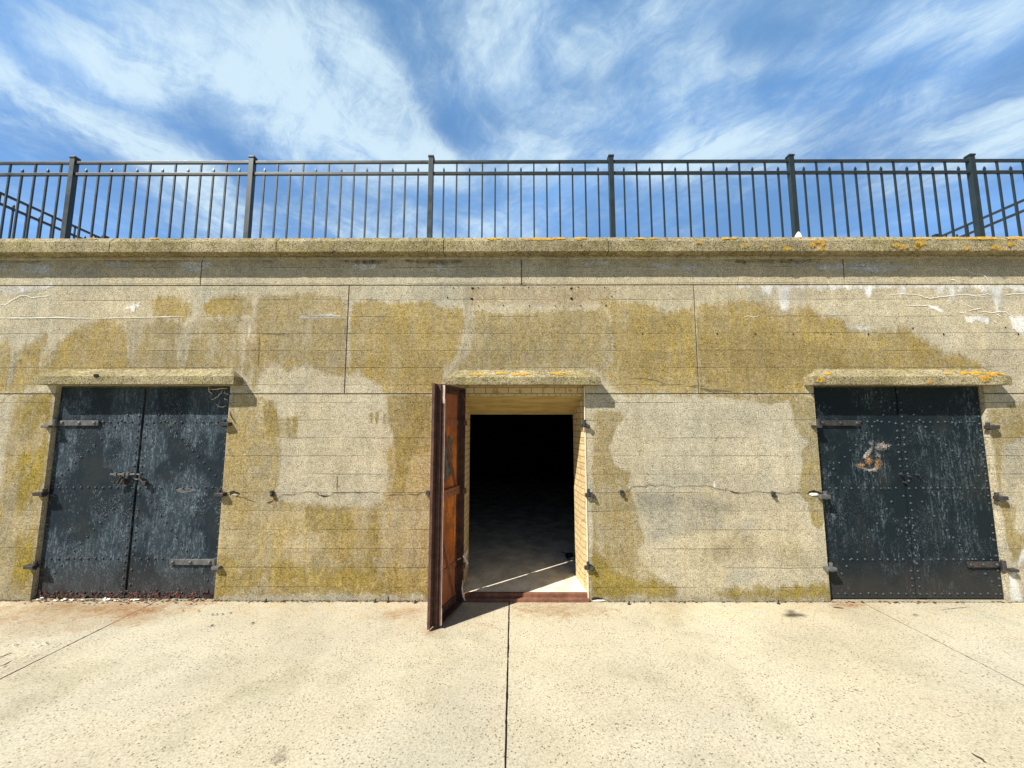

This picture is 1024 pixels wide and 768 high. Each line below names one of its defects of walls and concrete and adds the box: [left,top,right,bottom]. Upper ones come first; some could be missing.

water stain [0,285,1024,602]